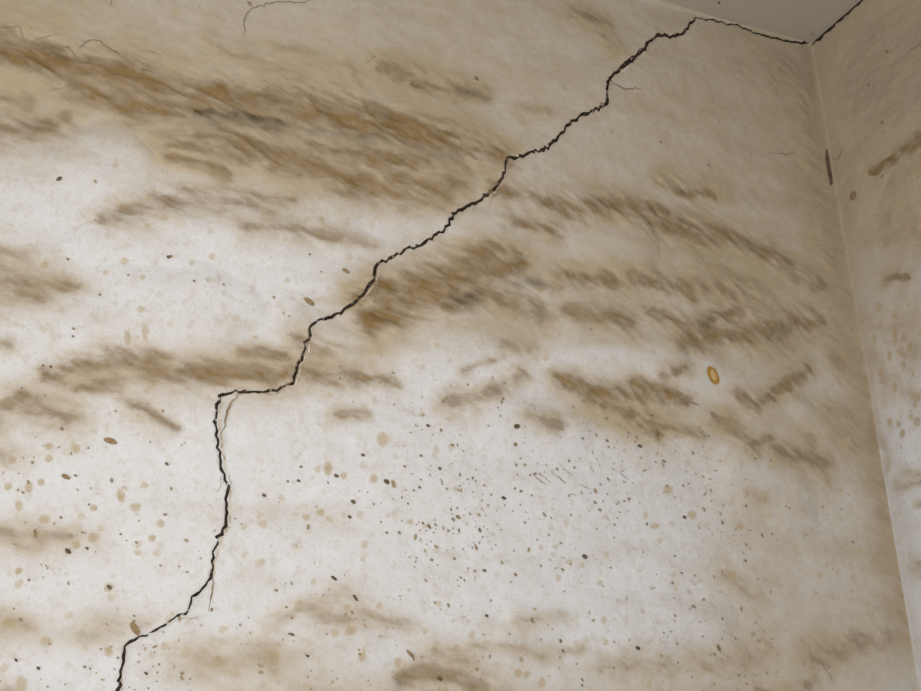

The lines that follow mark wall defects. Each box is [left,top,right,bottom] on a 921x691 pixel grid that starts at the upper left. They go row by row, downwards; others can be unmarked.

crack [243,0,307,35]
crack [0,25,160,77]
leakage [64,78,187,121]
leakage [236,86,293,110]
leakage [164,153,232,182]
leakage [306,140,432,172]
leakage [273,224,344,242]
leakage [514,219,560,238]
leakage [561,302,635,328]
crack [115,17,809,691]
leakage [129,403,181,431]
leakage [599,400,700,441]